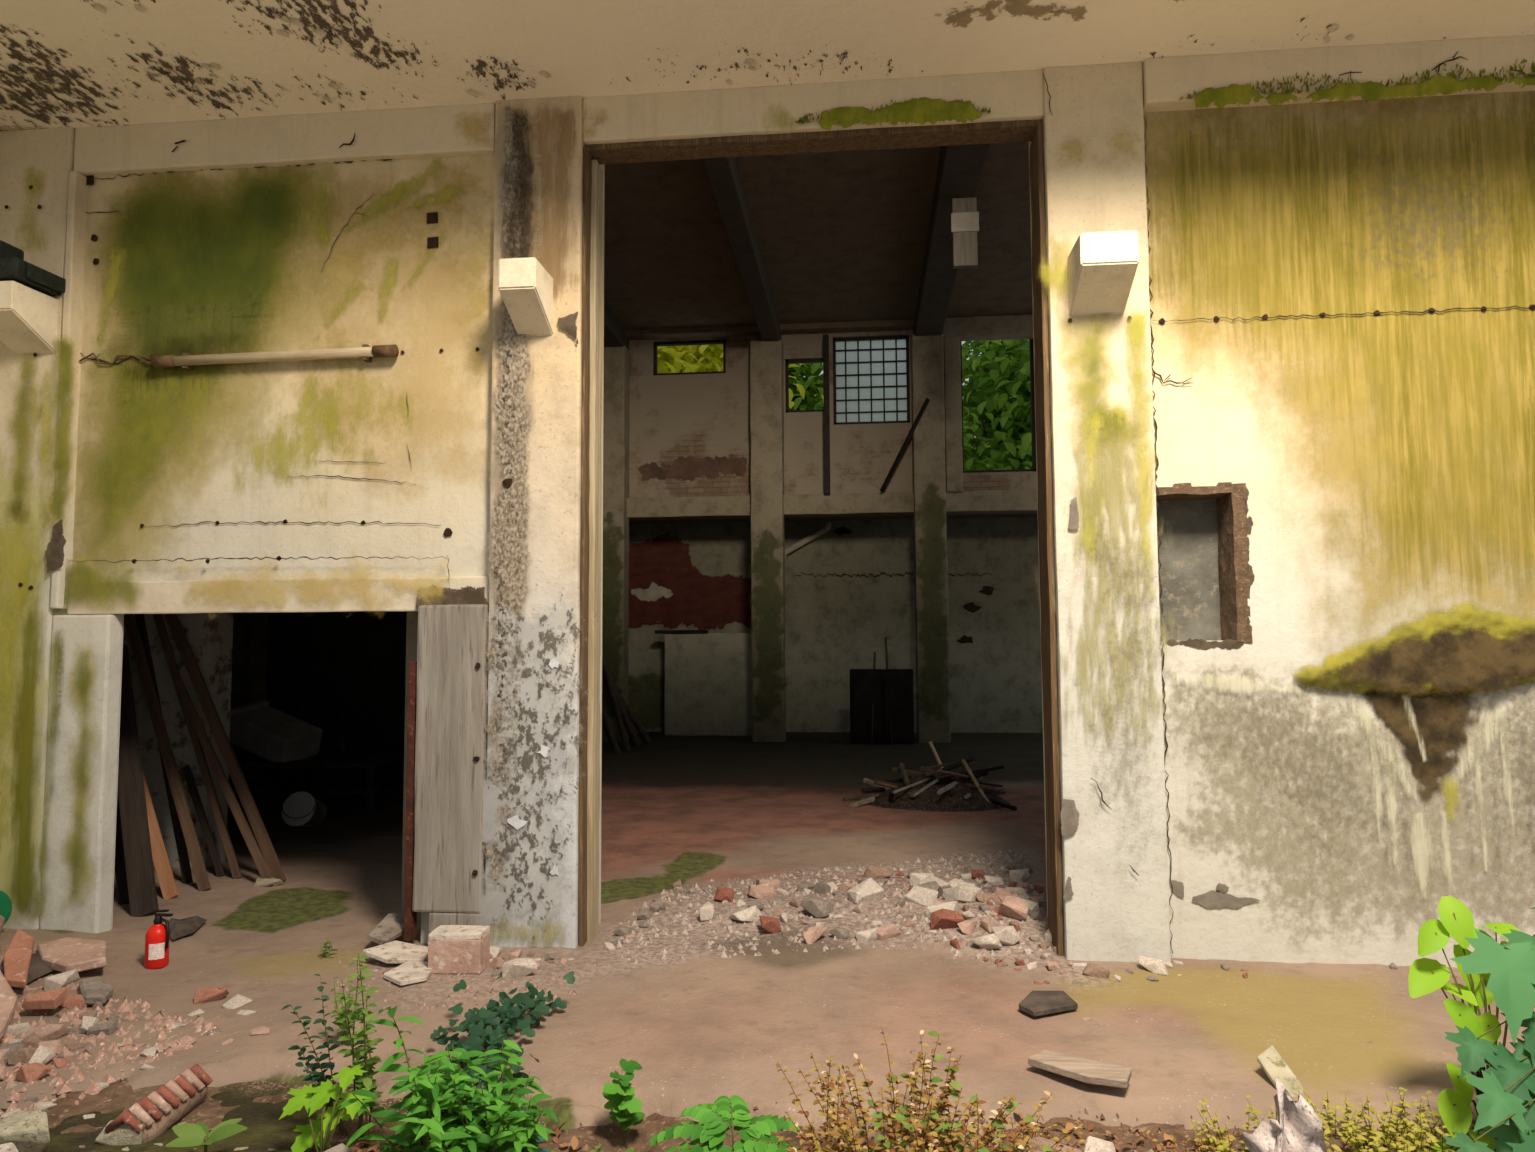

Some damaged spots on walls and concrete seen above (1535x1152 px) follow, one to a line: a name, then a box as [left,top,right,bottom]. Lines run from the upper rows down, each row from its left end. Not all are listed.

water stain [97,109,575,472]
spalling [457,55,551,259]
water stain [0,474,47,909]
peeling [416,303,597,948]
peeling [629,533,751,630]
water stain [1077,313,1535,929]